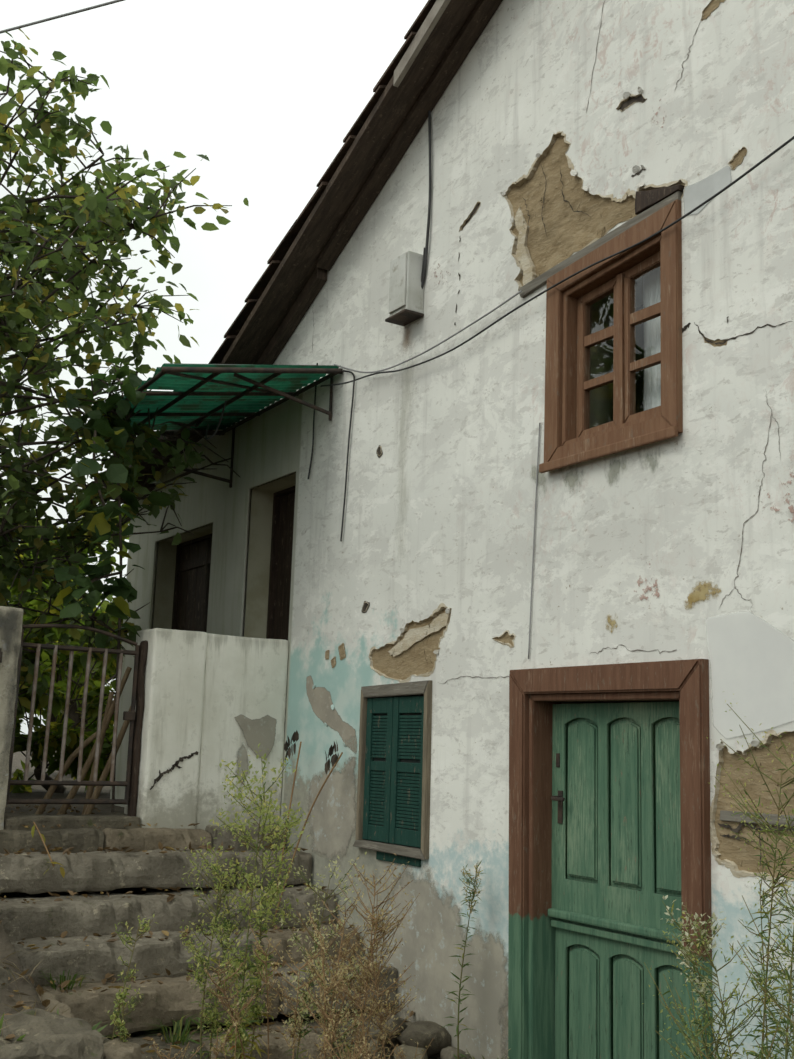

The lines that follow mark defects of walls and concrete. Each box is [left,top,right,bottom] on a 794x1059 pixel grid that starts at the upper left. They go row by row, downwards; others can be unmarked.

spalling [673,0,725,94]
spalling [616,86,664,128]
spalling [500,131,688,289]
crack [682,316,790,347]
crack [720,389,780,609]
damp [0,610,18,652]
spalling [368,603,452,683]
crack [150,751,199,790]
peeling [306,676,357,861]
spalling [710,729,794,884]